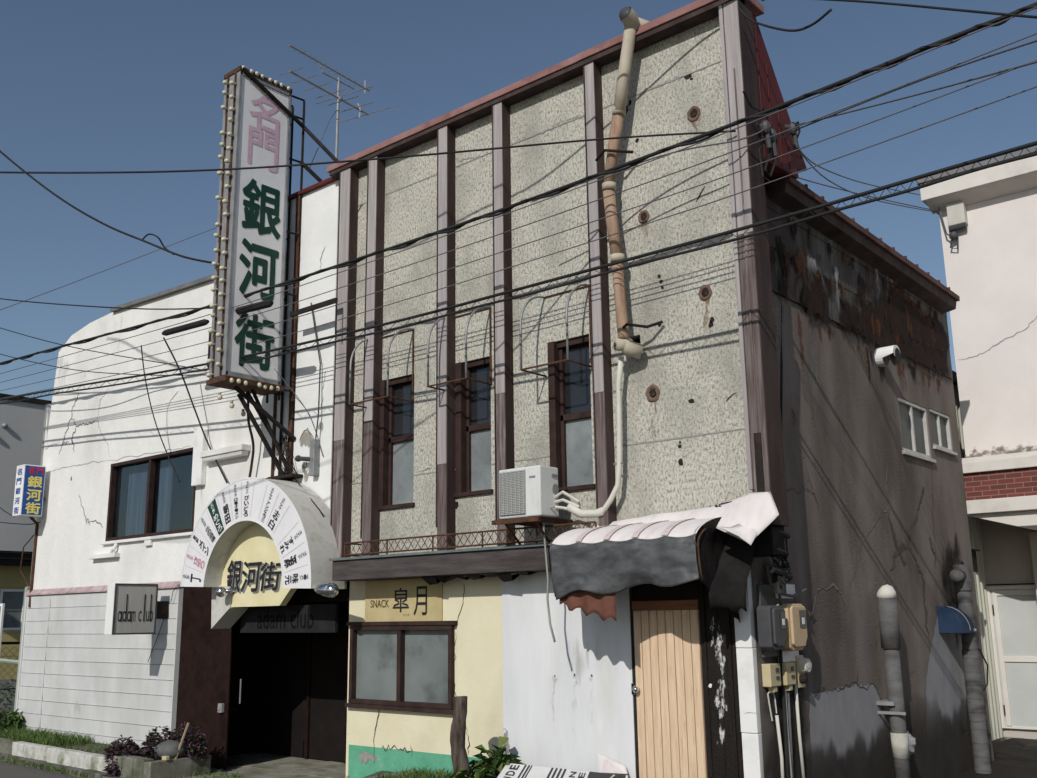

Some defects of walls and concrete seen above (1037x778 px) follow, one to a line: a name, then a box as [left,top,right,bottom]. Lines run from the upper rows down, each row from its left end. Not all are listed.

corrosion [769,219,950,393]
crack [958,317,1037,360]
crack [46,372,182,471]
crack [802,472,937,711]
water stain [942,536,960,608]
peeling [708,627,727,743]
water stain [765,685,895,778]
water stain [906,707,1037,778]